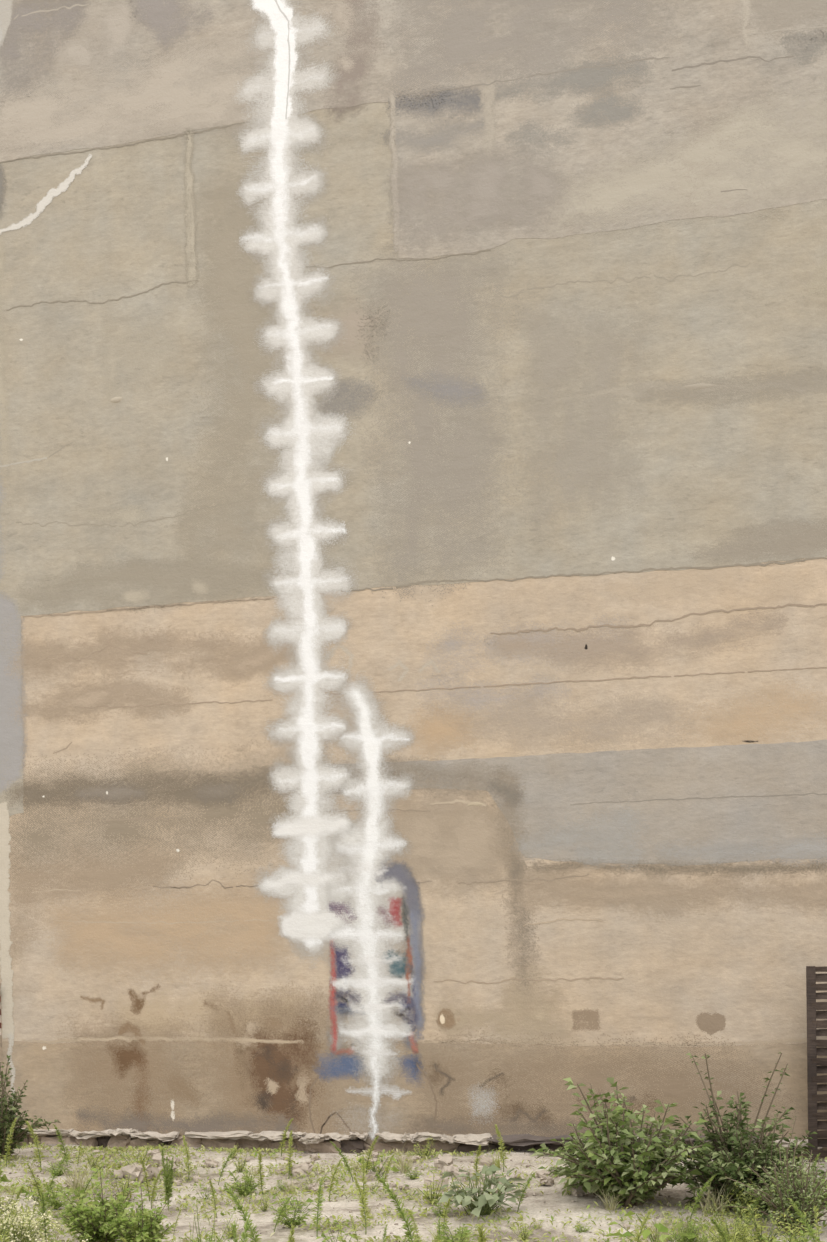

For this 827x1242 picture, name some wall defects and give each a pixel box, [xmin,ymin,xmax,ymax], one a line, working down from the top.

crack [275,0,290,119]
crack [298,249,491,268]
crack [490,603,827,634]
leakage [0,164,359,1148]
crack [323,667,827,695]
crack [326,799,486,812]